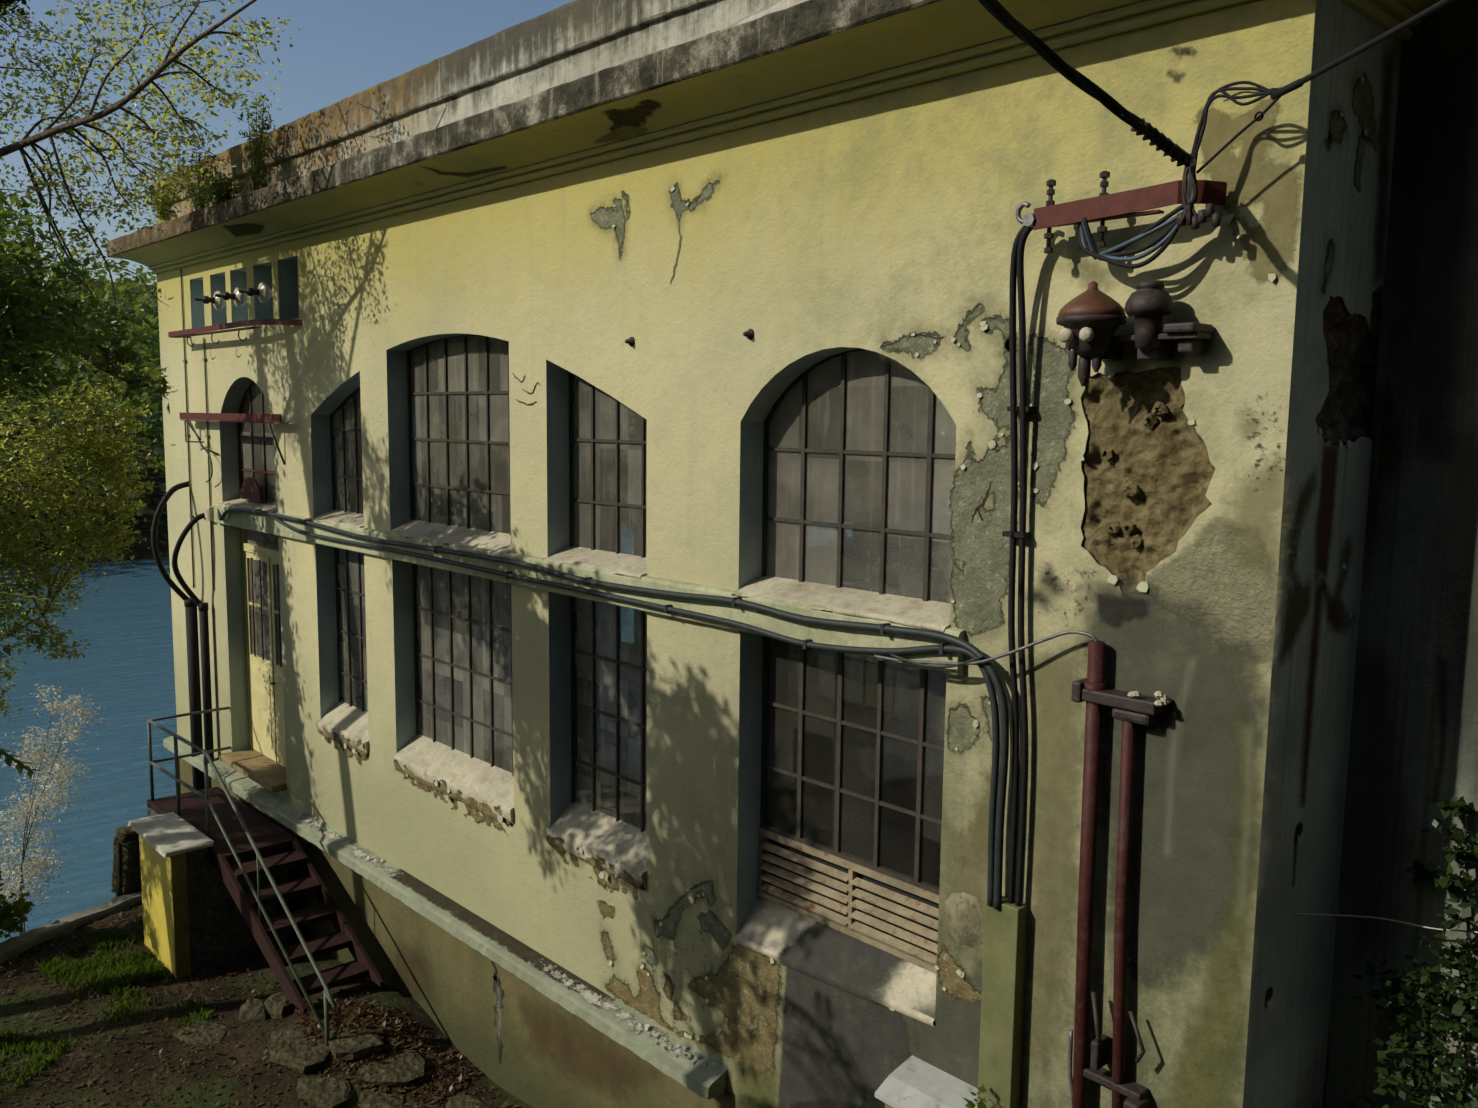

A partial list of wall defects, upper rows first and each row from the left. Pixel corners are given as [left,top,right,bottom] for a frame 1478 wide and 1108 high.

water stain [728,0,808,28]
water stain [426,166,507,177]
peeling [589,190,630,259]
water stain [594,100,661,143]
peeling [669,179,720,223]
peeling [1324,74,1377,192]
spalling [1315,238,1382,449]
spalling [880,303,1216,637]
water stain [1036,569,1263,986]
peeling [528,880,783,1075]